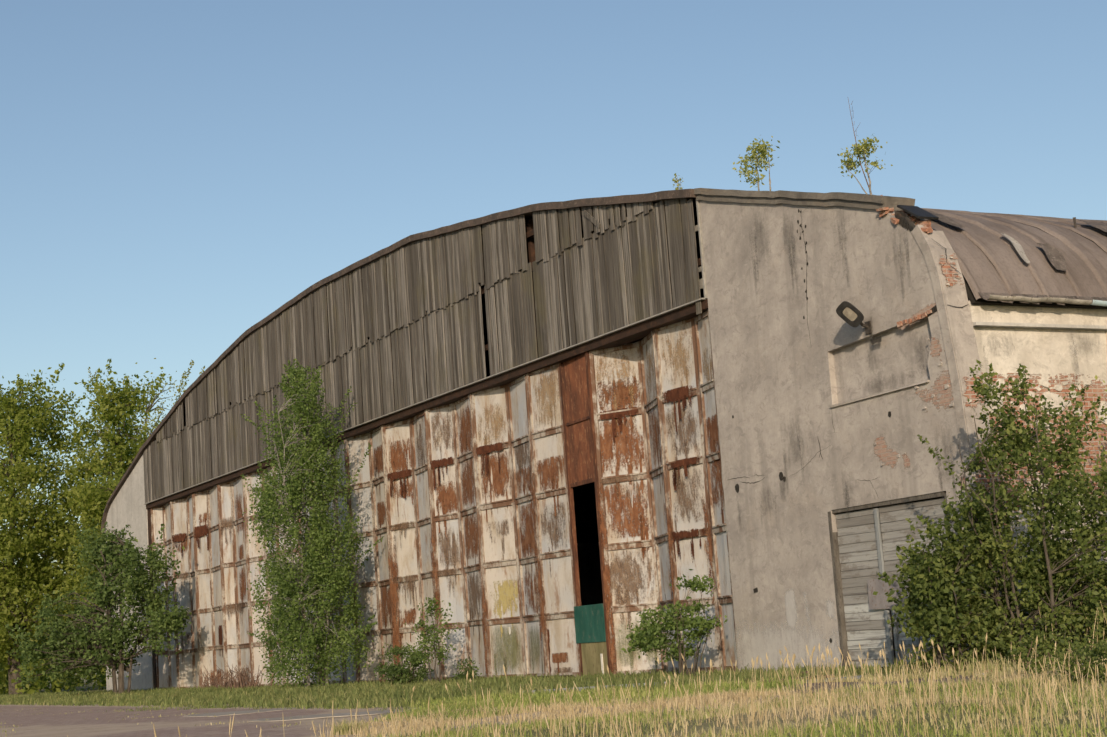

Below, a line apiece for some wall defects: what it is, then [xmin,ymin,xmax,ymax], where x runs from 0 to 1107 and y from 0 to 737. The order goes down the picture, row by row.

corrosion [172,494,246,683]
corrosion [373,406,572,675]
corrosion [535,373,559,436]
corrosion [596,329,725,671]
spalling [876,195,939,234]
spalling [896,302,938,331]
flaking render [939,253,964,288]
flaking render [915,337,1107,542]